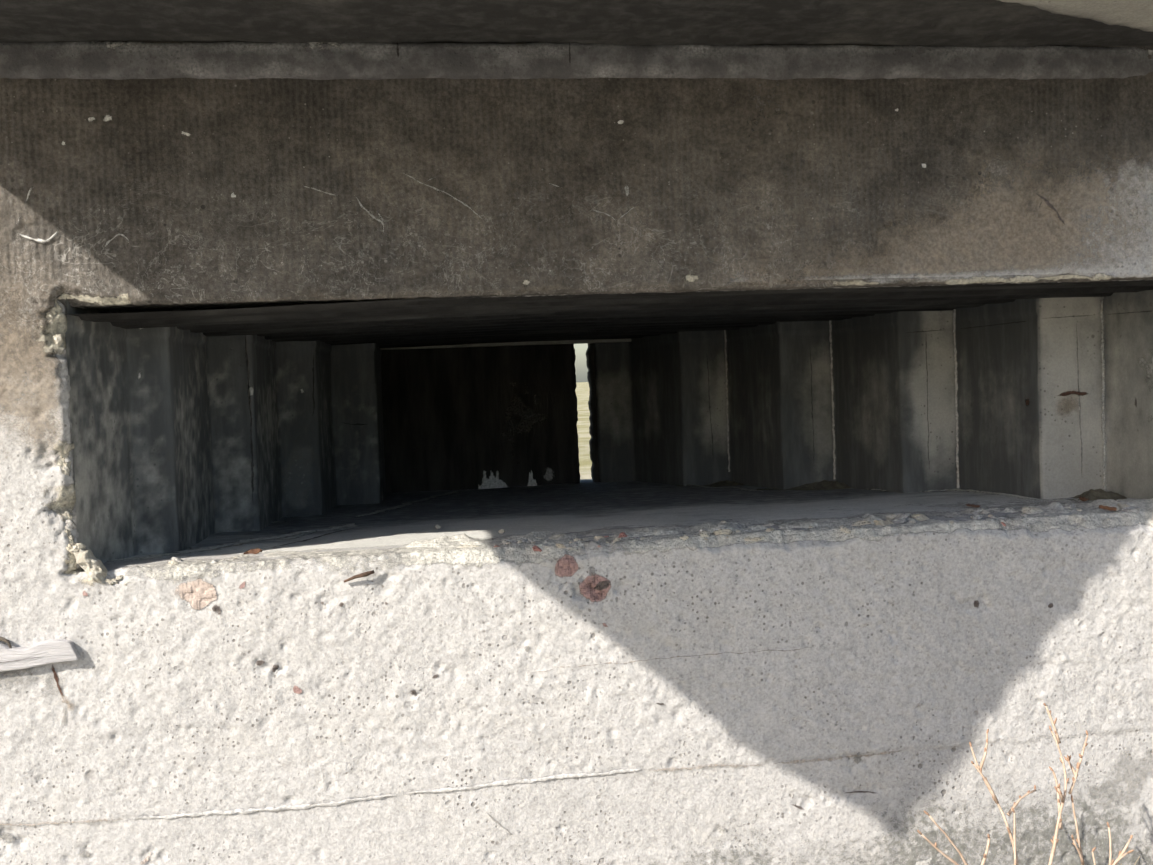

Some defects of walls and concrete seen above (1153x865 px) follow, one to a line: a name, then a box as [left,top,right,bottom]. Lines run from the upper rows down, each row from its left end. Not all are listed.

spalling [33,293,130,354]
spalling [44,440,77,574]